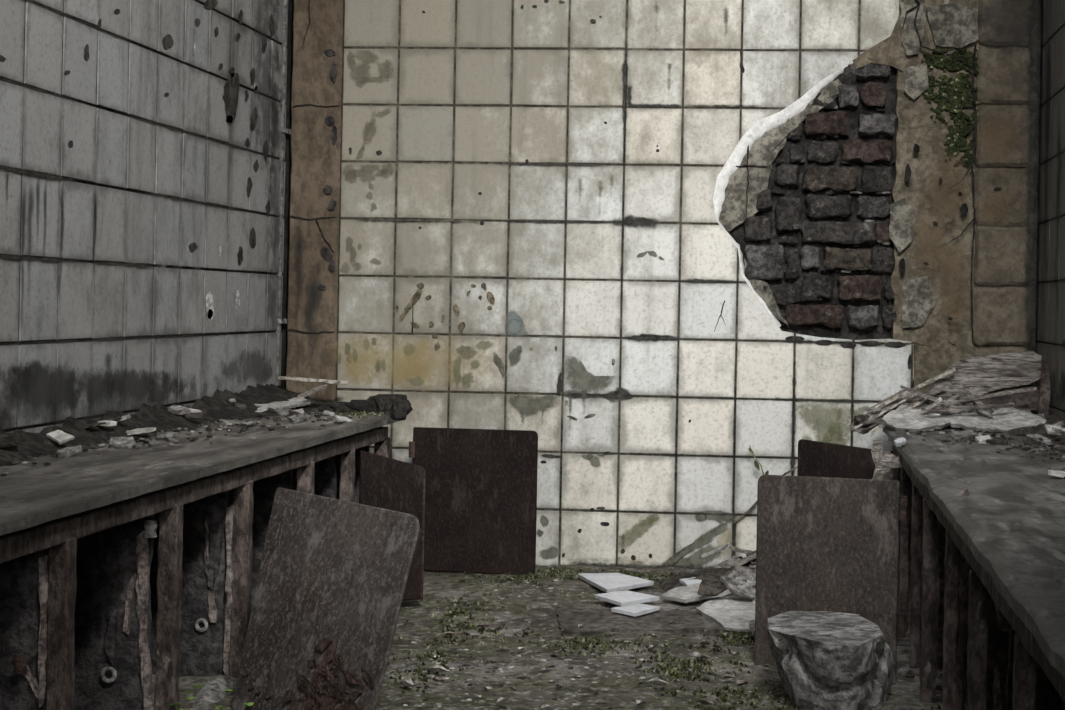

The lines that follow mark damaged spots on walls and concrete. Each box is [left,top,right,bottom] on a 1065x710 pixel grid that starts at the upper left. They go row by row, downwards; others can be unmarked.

damp [347,51,393,87]
damp [344,110,461,223]
spalling [713,0,979,393]
damp [0,197,152,268]
damp [341,238,380,272]
damp [5,333,221,345]
damp [493,311,527,377]
damp [510,357,633,537]